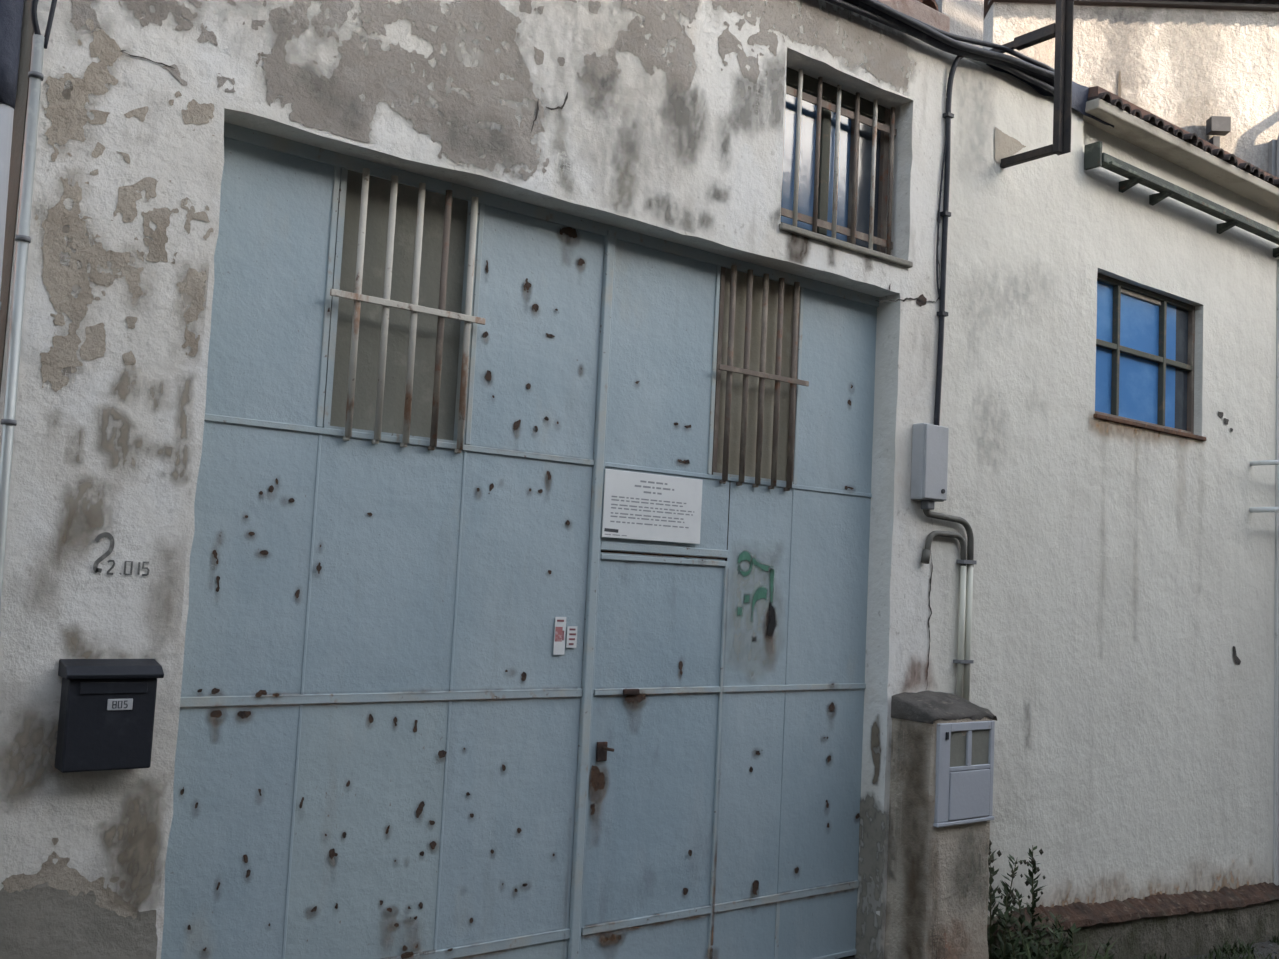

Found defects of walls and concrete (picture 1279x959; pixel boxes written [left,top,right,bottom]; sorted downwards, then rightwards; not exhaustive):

peeling [577,0,917,109]
peeling [217,73,236,92]
peeling [242,0,565,180]
peeling [34,0,218,481]
corrosion [559,227,577,239]
corrosion [788,233,810,264]
peeling [67,481,104,531]
corrosion [416,801,435,825]
corrosion [590,765,605,815]
peeling [0,797,159,959]
corrosion [686,883,715,959]
corrosion [385,944,453,959]